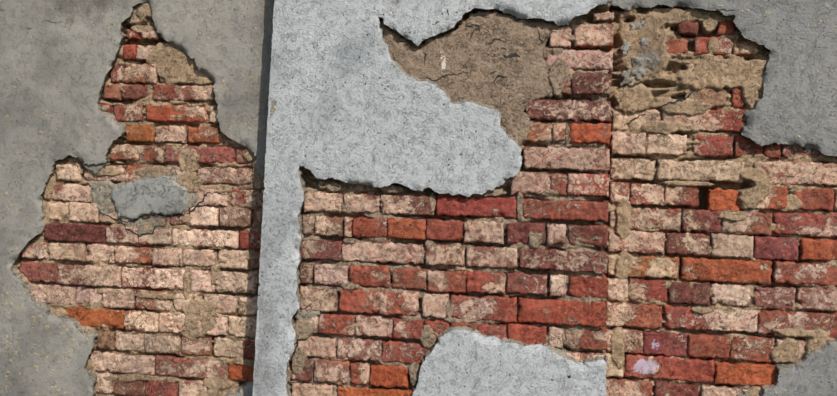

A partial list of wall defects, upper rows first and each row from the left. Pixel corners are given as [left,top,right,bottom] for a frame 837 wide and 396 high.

spalling [10,3,265,396]
spalling [286,3,837,396]